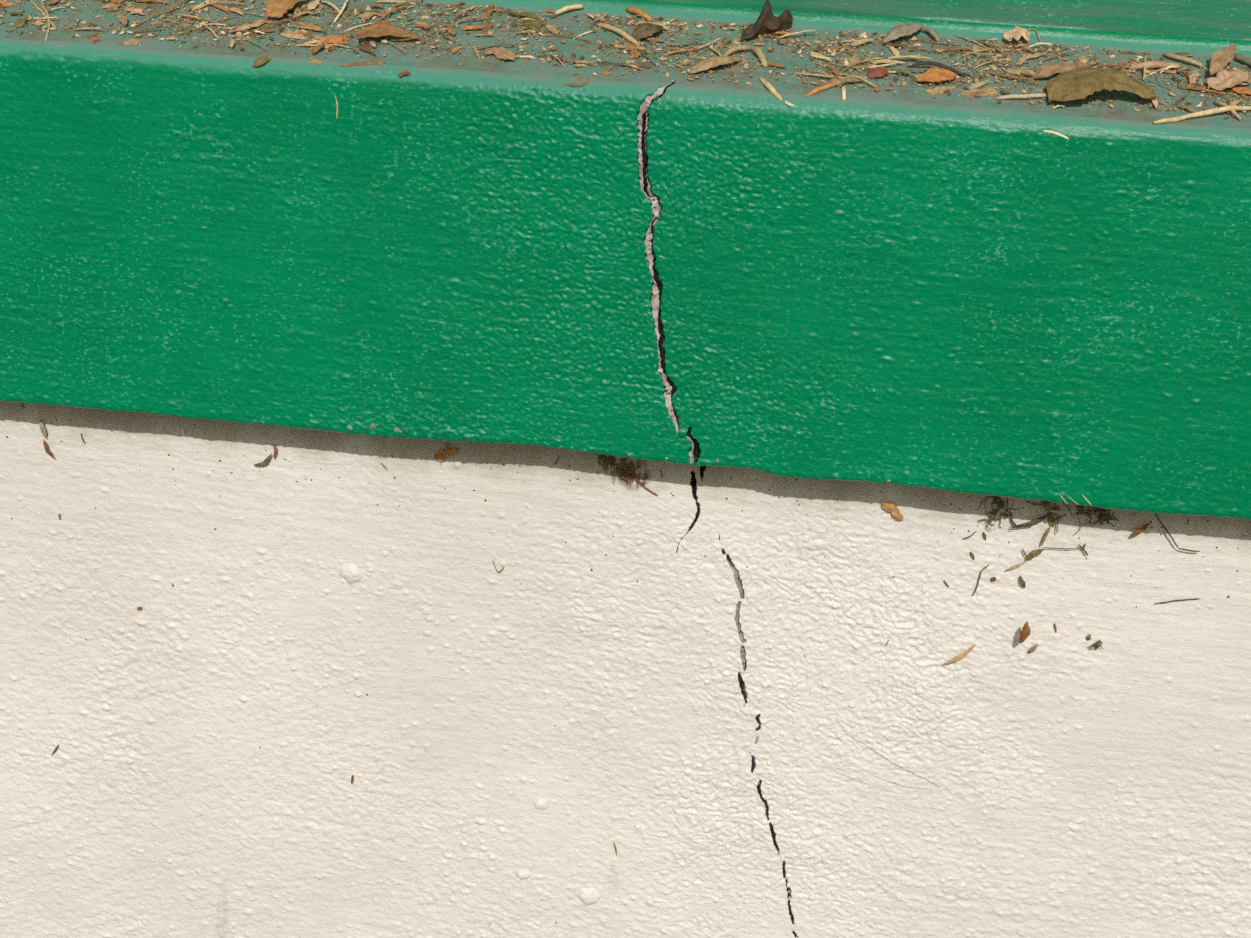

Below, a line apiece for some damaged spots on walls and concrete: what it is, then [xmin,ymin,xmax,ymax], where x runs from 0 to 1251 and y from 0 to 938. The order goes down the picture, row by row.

crack [637,78,798,938]